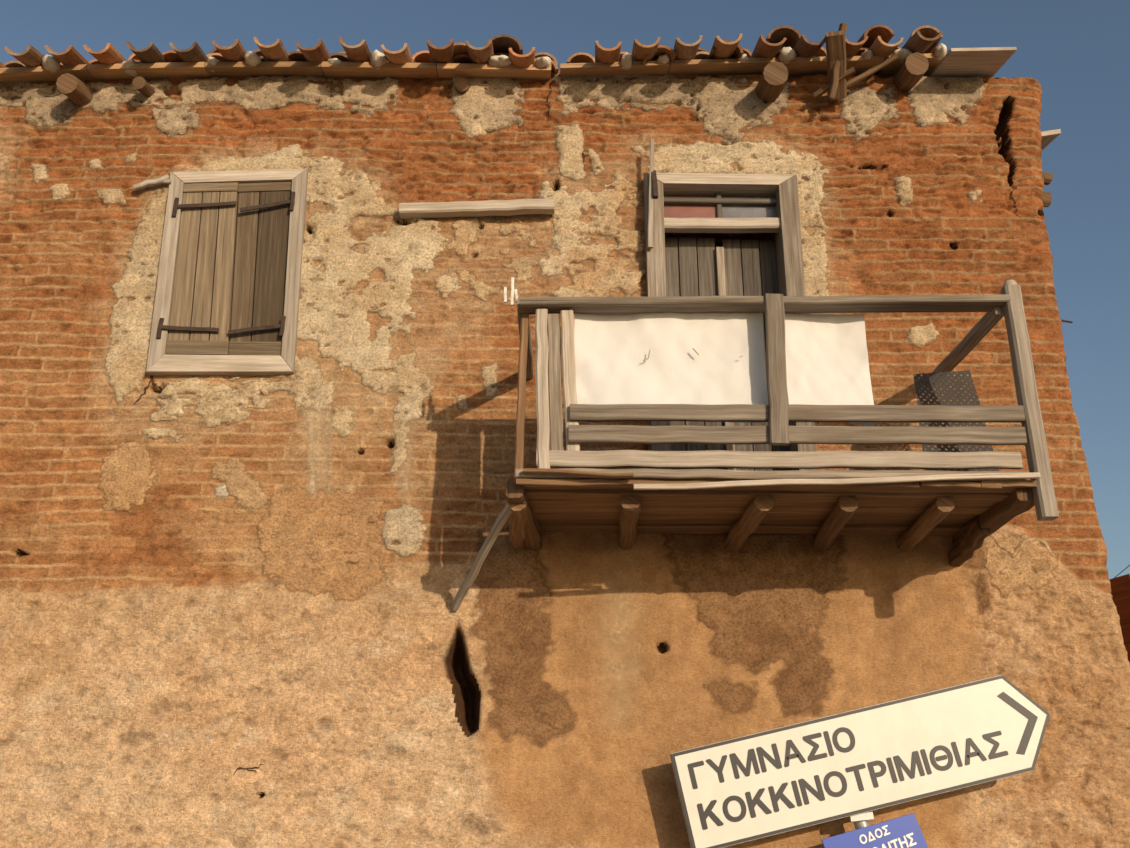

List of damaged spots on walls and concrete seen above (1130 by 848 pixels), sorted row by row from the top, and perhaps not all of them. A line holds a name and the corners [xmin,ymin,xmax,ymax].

peeling [0,75,399,137]
peeling [840,76,985,140]
spalling [31,163,70,200]
spalling [89,159,103,169]
spalling [97,188,126,205]
spalling [894,176,914,206]
crack [994,96,1020,217]
peeling [105,73,829,472]
spalling [908,323,939,347]
peeling [211,457,268,512]
peeling [964,532,1058,614]
spalling [445,525,577,747]